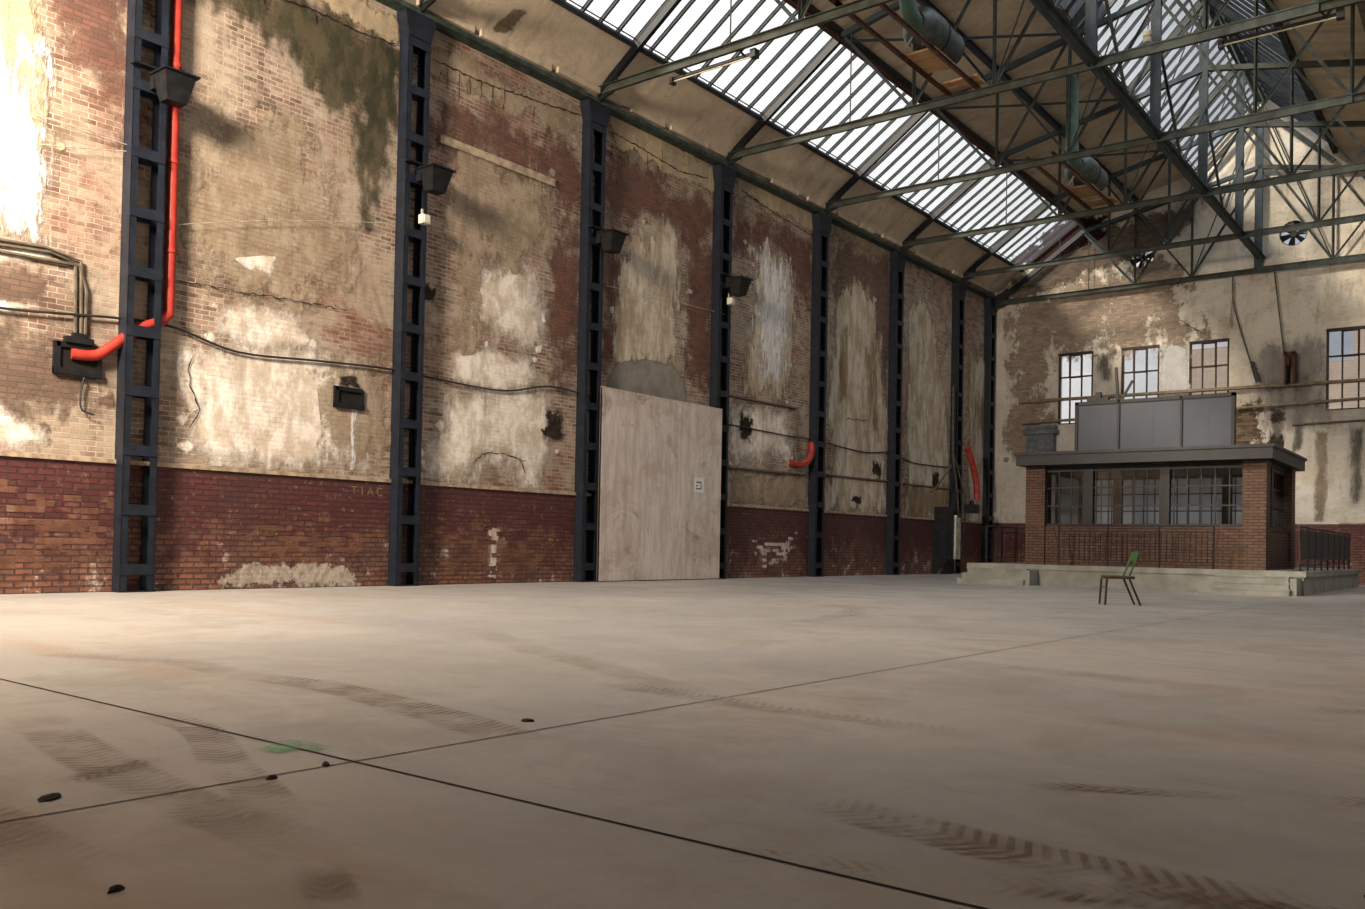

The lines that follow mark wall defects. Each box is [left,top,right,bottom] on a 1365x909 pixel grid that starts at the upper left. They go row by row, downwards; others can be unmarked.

flaking render [0,0,152,450]
flaking render [164,98,391,474]
spalling [209,514,365,589]
leakage [192,0,400,232]
flaking render [421,47,583,489]
flaking render [602,115,714,393]
flaking render [728,177,813,508]
spalling [752,533,796,568]
flaking render [825,226,951,518]
flaking render [965,347,984,522]
flaking render [1002,200,1211,461]